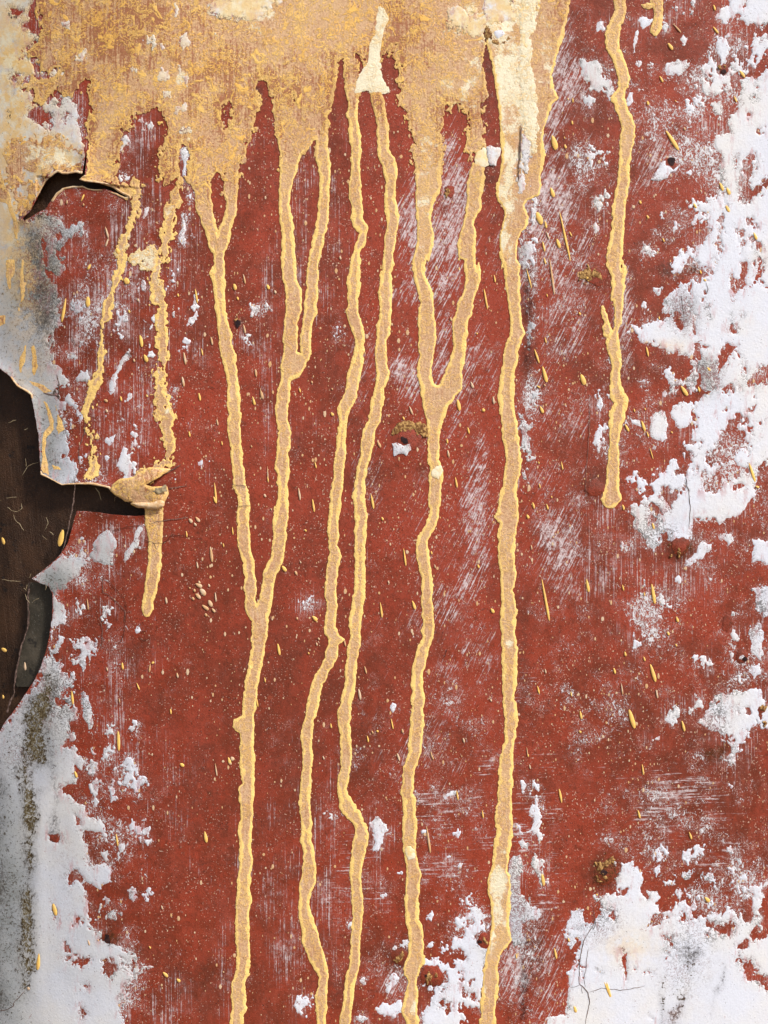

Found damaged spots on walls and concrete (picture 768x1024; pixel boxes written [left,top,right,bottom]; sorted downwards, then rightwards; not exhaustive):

peeling [579,58,615,109]
peeling [0,0,90,484]
peeling [163,203,195,291]
peeling [591,189,612,234]
peeling [109,306,139,395]
peeling [172,293,200,352]
peeling [626,0,768,584]
peeling [105,418,142,478]
peeling [593,389,610,452]
peeling [0,524,154,1024]
crack [570,912,639,1024]
peeling [547,843,768,1024]